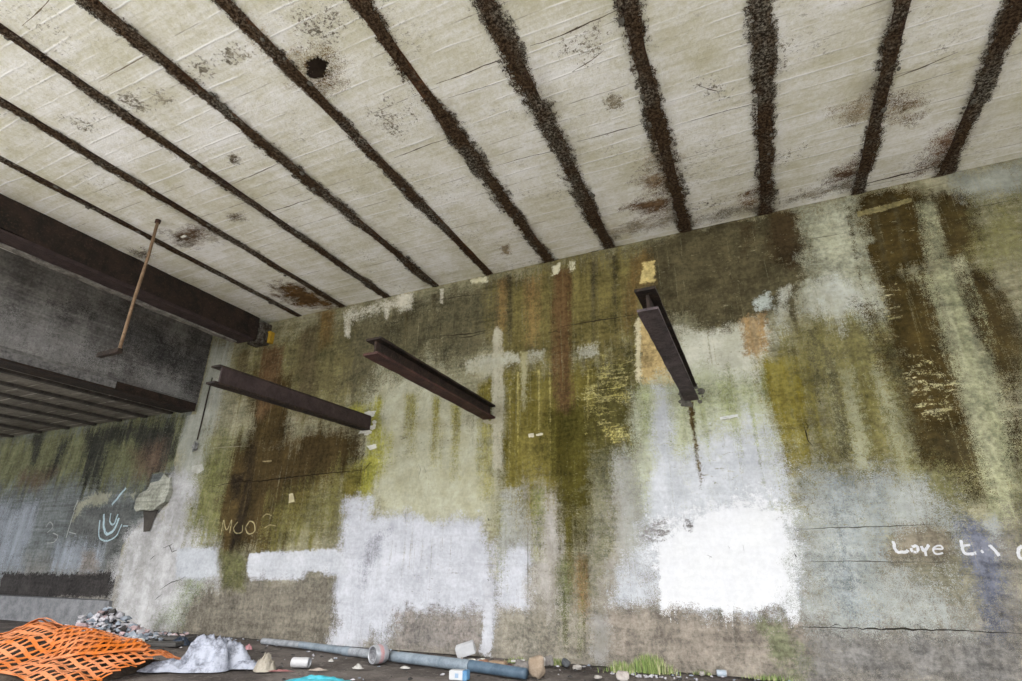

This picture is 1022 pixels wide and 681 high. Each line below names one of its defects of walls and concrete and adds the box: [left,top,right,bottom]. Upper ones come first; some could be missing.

spalling [0,0,438,317]
spalling [211,0,493,276]
spalling [343,0,558,263]
spalling [469,0,619,250]
spalling [611,0,694,233]
spalling [740,0,785,216]
spalling [850,0,911,196]
spalling [931,0,1022,178]
corrosion [258,279,340,353]
damp [0,158,1022,681]
corrosion [687,401,703,488]
crack [807,624,1018,634]